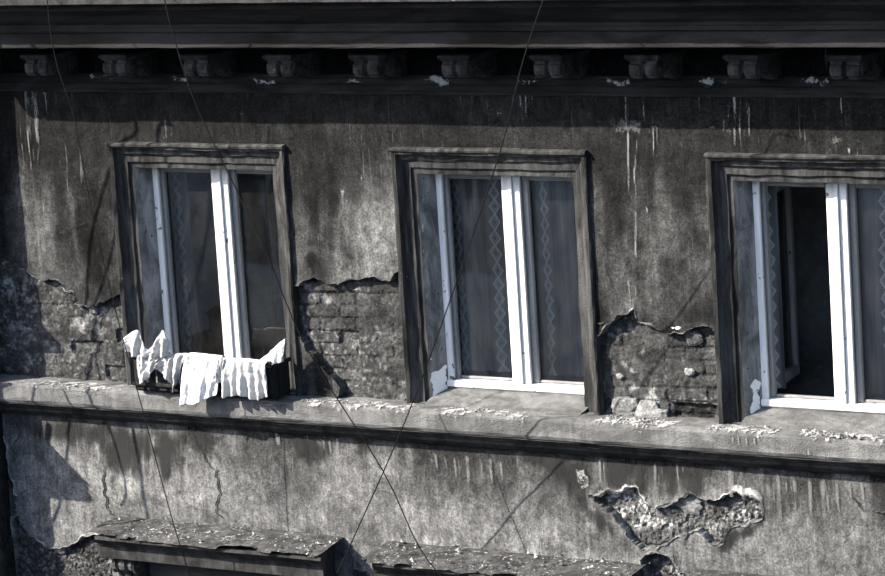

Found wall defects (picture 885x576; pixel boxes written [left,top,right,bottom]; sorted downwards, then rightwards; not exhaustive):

leakage [24,91,47,153]
leakage [427,75,449,86]
spalling [0,256,127,382]
spalling [295,271,406,401]
spalling [599,307,719,420]
crack [102,470,115,516]
leakage [34,419,212,480]
spalling [576,469,765,576]